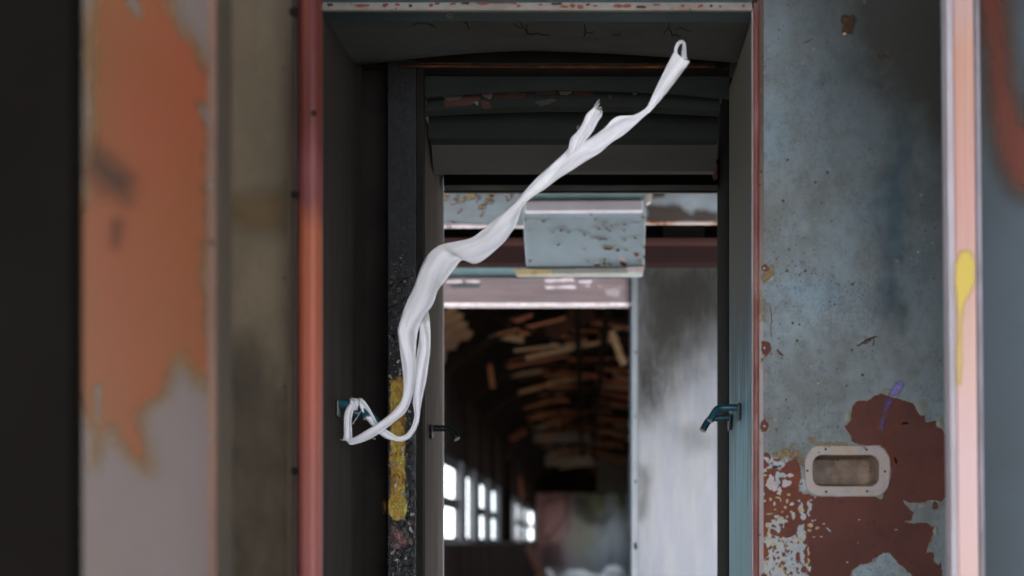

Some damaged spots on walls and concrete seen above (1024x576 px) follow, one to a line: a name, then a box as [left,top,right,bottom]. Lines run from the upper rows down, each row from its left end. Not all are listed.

rust [841,15,856,35]
peeling [443,91,593,110]
peeling [759,388,946,576]